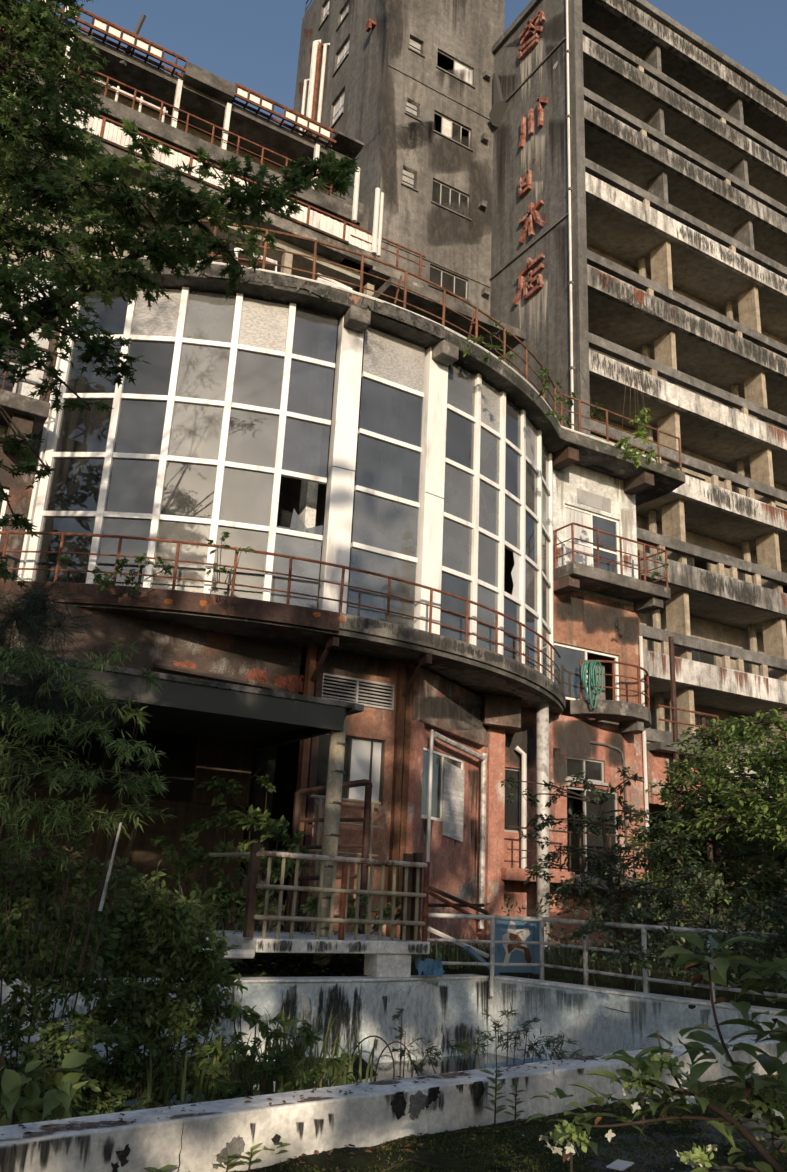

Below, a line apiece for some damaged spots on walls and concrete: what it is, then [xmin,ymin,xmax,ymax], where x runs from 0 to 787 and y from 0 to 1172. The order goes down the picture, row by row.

leakage [498,16,563,98]
leakage [378,0,508,244]
leakage [521,122,564,203]
rust [762,503,787,523]
leakage [281,984,362,1058]
peeling [362,984,443,1061]
peeling [368,1071,469,1120]
leakage [0,1135,90,1172]